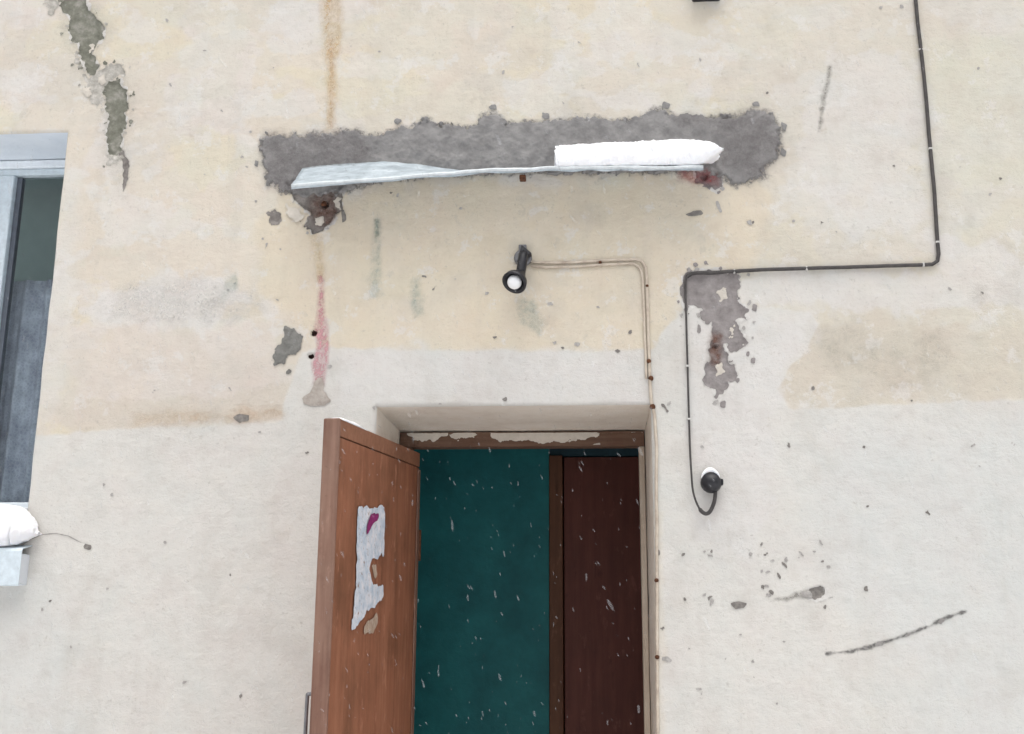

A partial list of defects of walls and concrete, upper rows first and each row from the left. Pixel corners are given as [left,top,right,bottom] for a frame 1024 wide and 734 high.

flaking render [43,0,135,191]
flaking render [683,168,725,212]
flaking render [677,261,757,408]
flaking render [749,540,833,609]